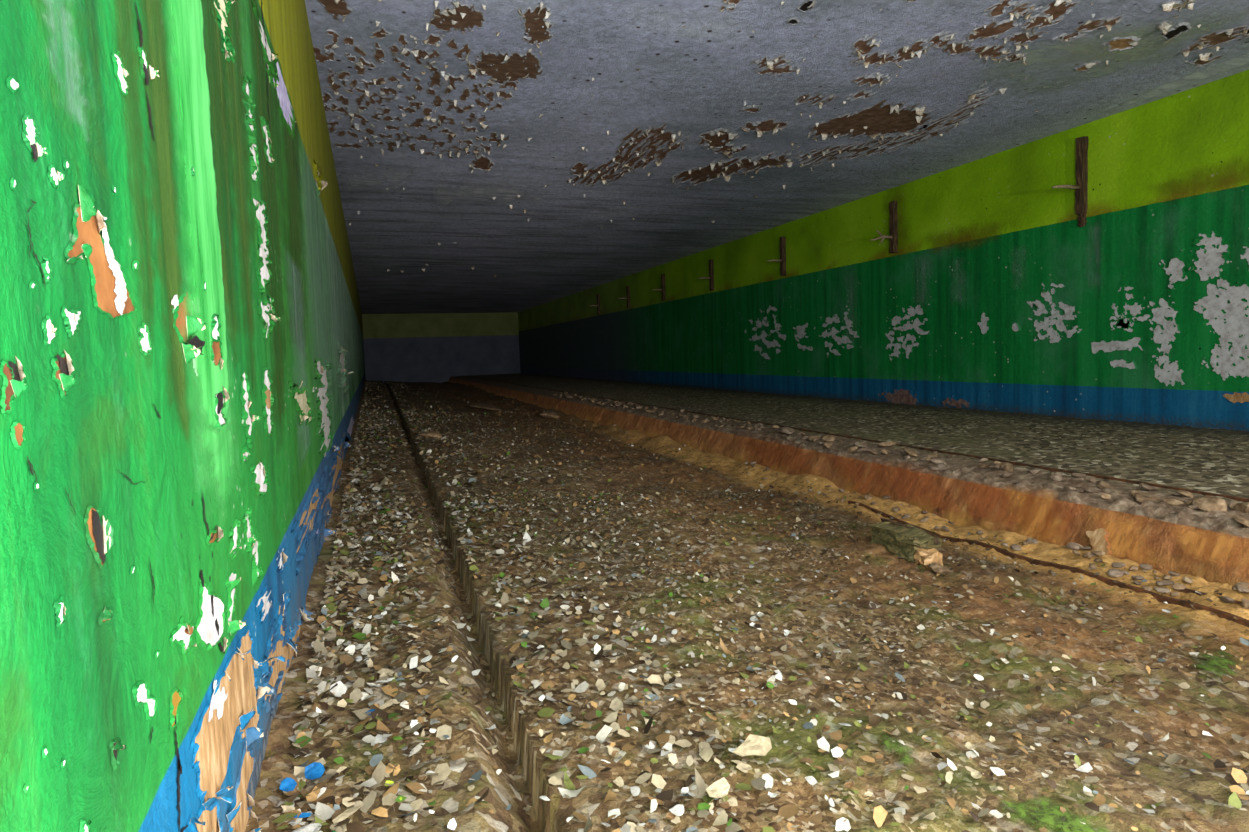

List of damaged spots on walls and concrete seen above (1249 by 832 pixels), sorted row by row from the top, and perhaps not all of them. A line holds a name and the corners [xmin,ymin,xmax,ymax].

peeling [22,114,152,400]
peeling [210,0,296,341]
peeling [313,0,556,173]
peeling [744,304,861,360]
peeling [566,0,1141,198]
peeling [885,296,934,364]
peeling [1011,230,1249,405]
peeling [1156,0,1249,68]
peeling [53,595,66,627]
peeling [154,342,355,832]
peeling [132,680,183,730]
crack [150,716,188,832]